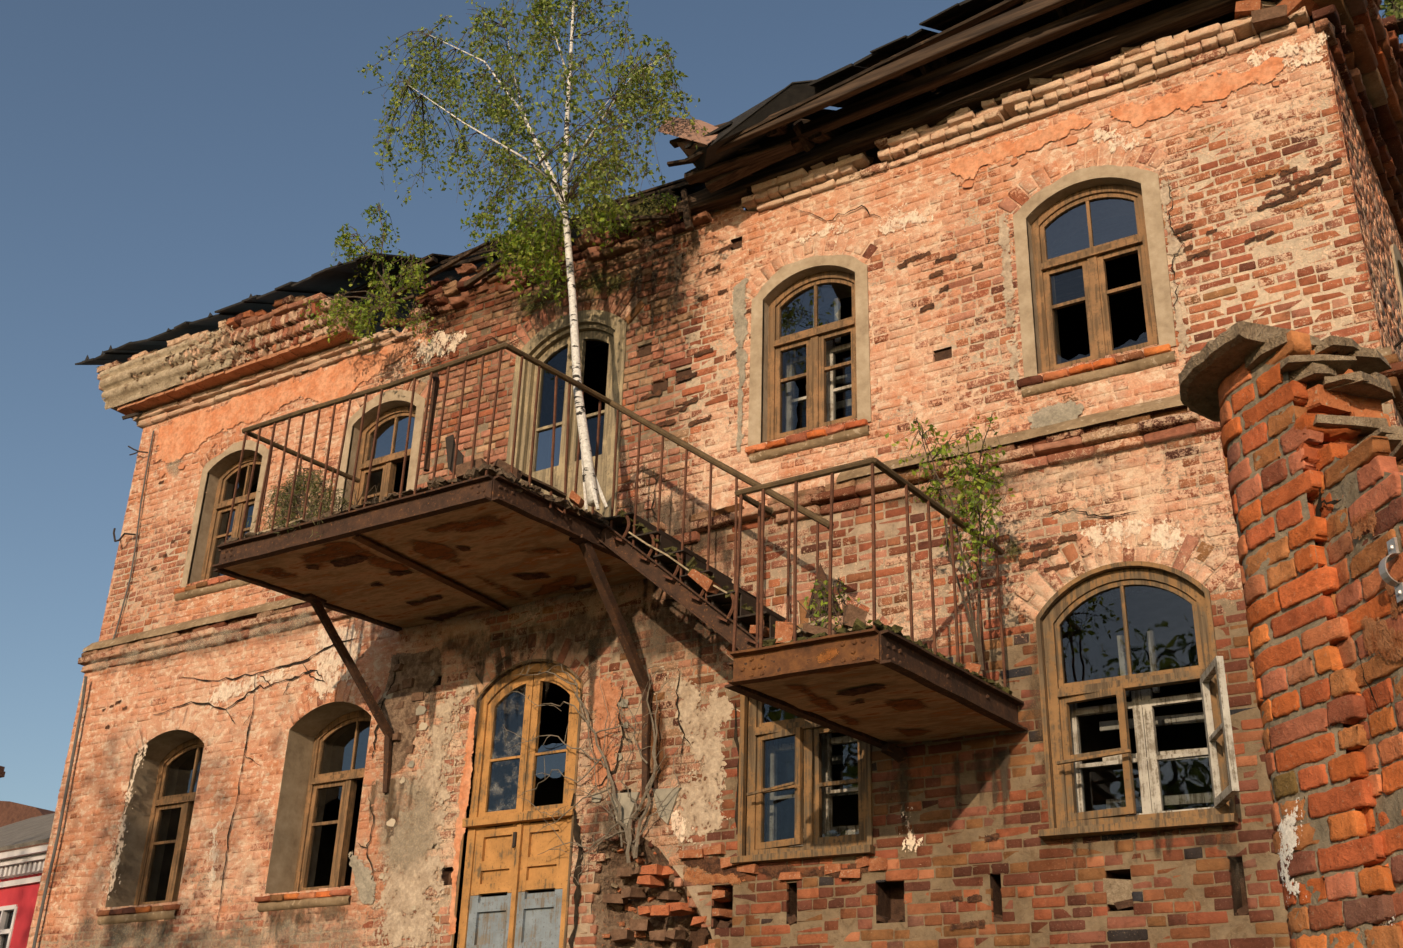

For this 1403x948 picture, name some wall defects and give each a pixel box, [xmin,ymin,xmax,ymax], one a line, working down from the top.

peeling [1108,57,1284,137]
peeling [949,113,1092,188]
peeling [154,328,467,485]
rust [412,516,505,562]
leakage [424,680,436,723]
leakage [443,578,720,739]
crack [154,637,362,928]
leakage [369,779,399,842]
spalling [585,663,905,948]
leakage [1278,797,1307,902]